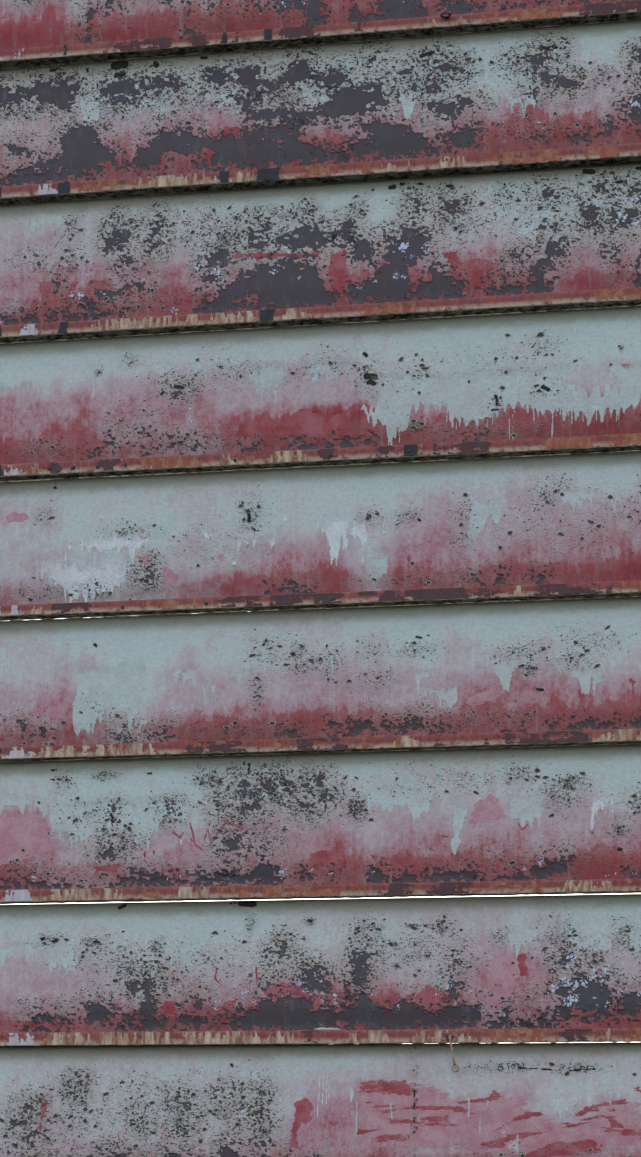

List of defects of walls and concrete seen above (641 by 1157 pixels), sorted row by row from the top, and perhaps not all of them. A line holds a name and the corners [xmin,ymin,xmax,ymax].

peeling [0,0,641,187]
rust [74,170,255,191]
rust [438,149,562,168]
peeling [0,171,641,325]
rust [92,311,254,331]
rust [277,307,316,320]
rust [32,743,159,758]
peeling [0,918,641,1043]
rust [38,1031,299,1045]
peeling [2,1071,126,1157]
peeling [124,1081,319,1157]
peeling [355,1072,641,1157]